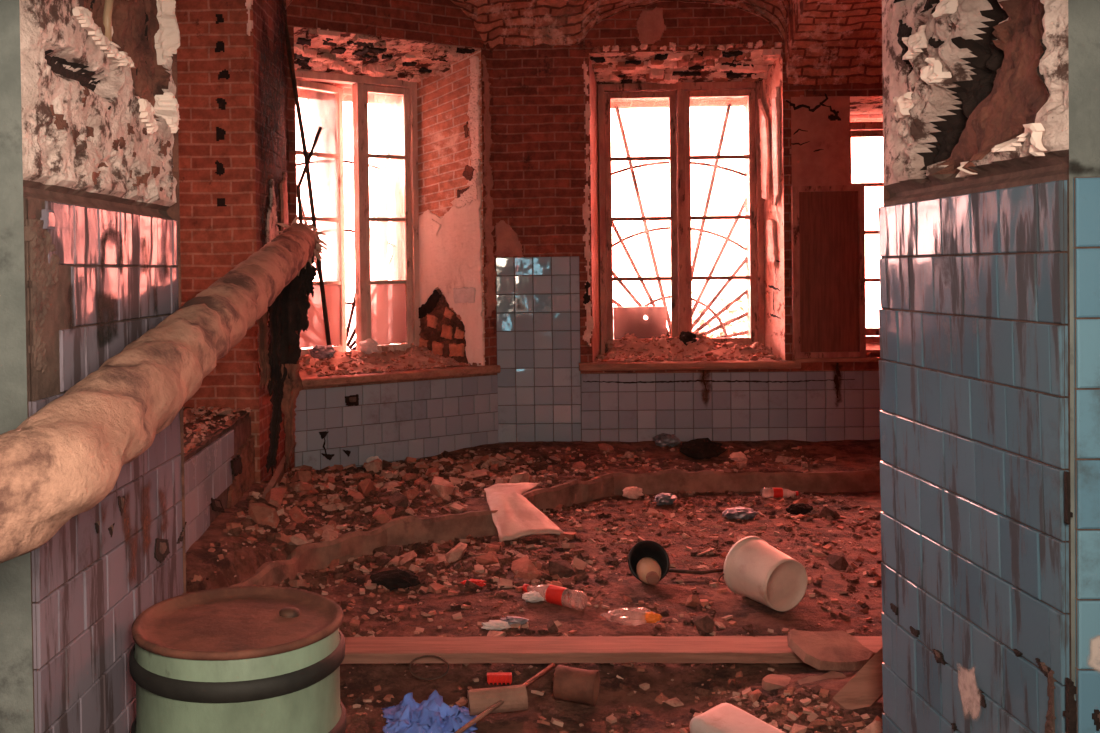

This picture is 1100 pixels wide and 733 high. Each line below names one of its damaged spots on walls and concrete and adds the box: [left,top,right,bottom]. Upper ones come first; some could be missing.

flaking render [49,105,94,149]
flaking render [72,0,181,191]
flaking render [294,28,524,366]
spalling [582,40,782,346]
crack [786,94,841,152]
flaking render [893,92,914,119]
flaking render [897,0,1050,177]